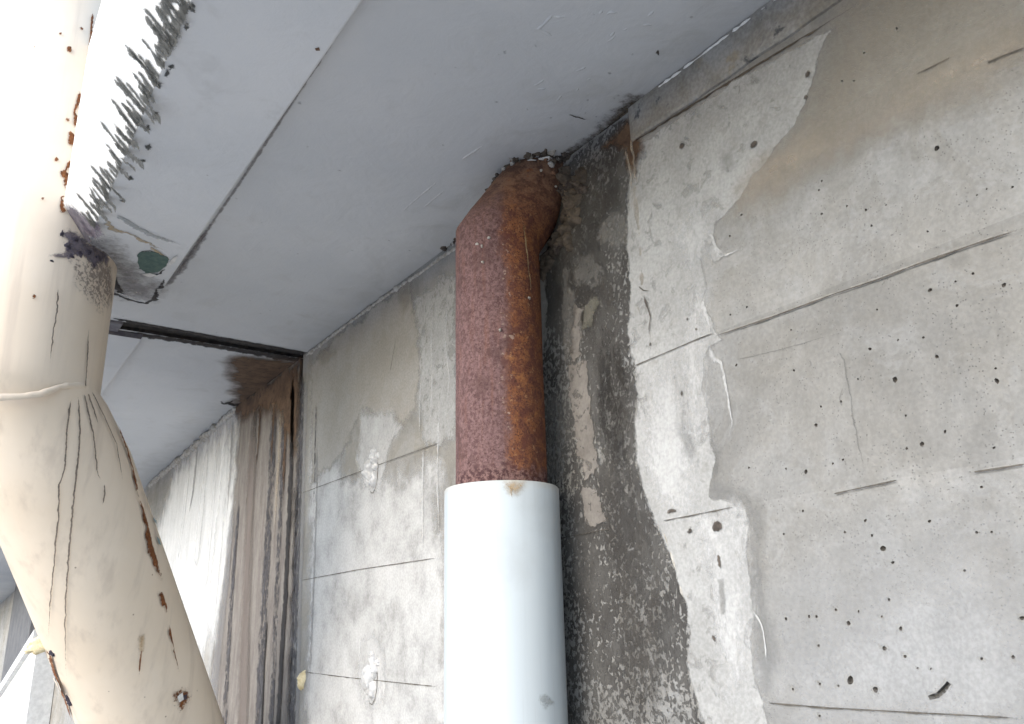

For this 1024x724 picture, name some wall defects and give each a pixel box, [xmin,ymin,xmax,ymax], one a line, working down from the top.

corrosion [66,93,81,145]
corrosion [55,157,71,212]
peeling [105,217,178,277]
crack [48,332,122,659]
corrosion [118,425,161,577]
leakage [158,274,456,724]
corrosion [45,649,72,717]
corrosion [172,689,192,713]